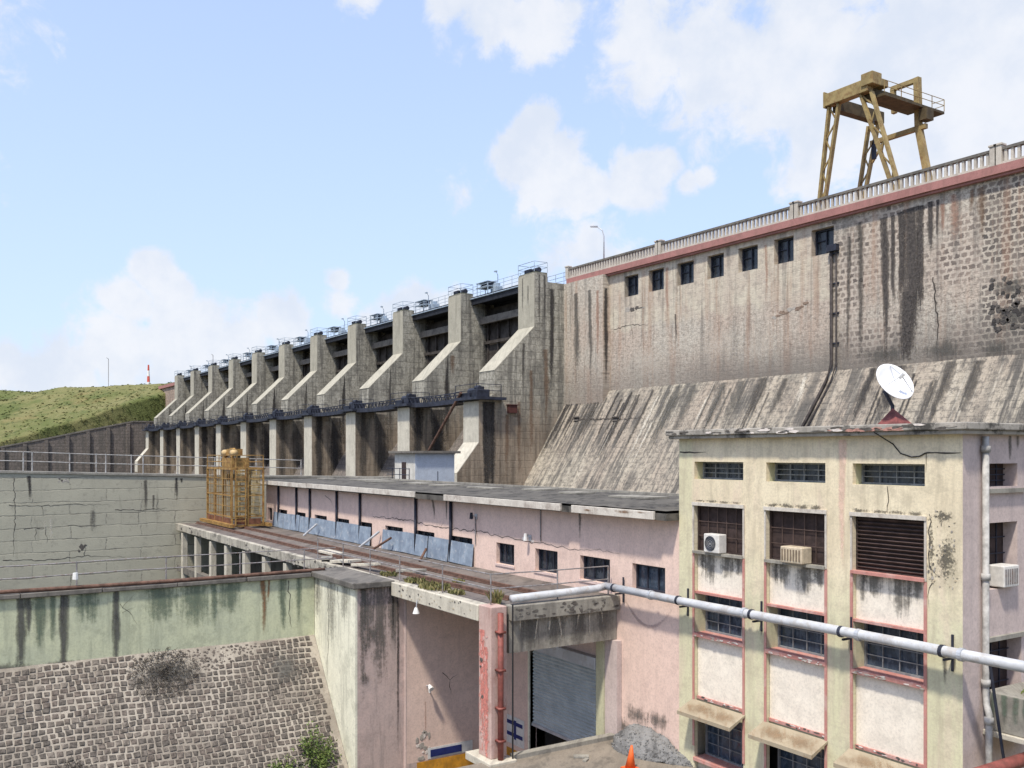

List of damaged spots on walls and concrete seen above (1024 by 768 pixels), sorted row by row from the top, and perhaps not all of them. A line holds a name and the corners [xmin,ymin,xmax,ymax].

damp [854,199,956,425]
peeling [988,276,1024,333]
damp [955,343,1004,418]
damp [0,594,96,669]
crack [3,478,159,561]
damp [112,591,120,657]
damp [701,554,741,578]
damp [773,563,822,591]
damp [861,575,881,596]
damp [894,579,922,607]
damp [928,511,955,575]
peeling [479,629,489,757]